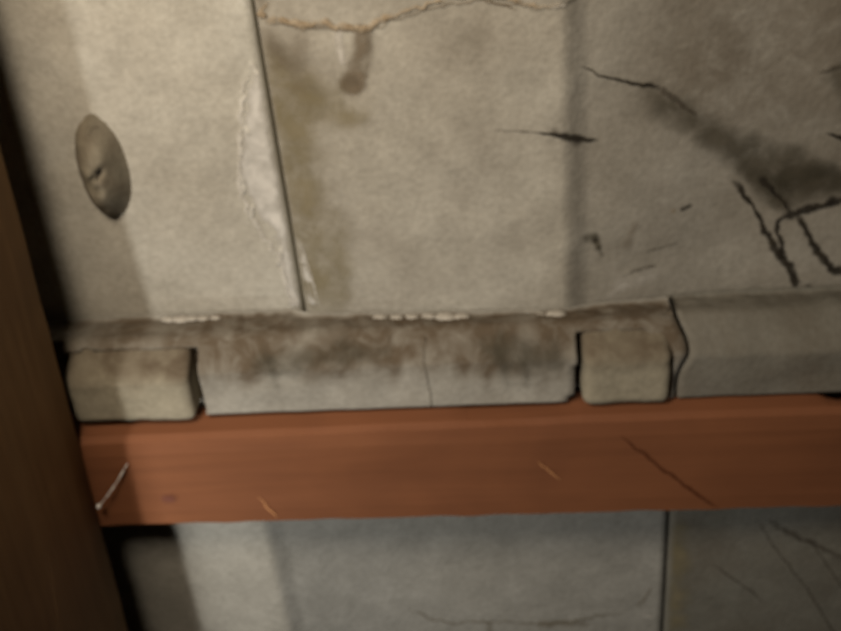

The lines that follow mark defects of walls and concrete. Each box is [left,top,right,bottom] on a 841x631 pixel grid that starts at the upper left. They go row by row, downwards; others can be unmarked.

crack [256,0,571,33]
crack [584,67,692,112]
crack [503,130,594,142]
leakage [702,127,841,203]
crack [736,177,841,287]
leakage [372,312,471,321]